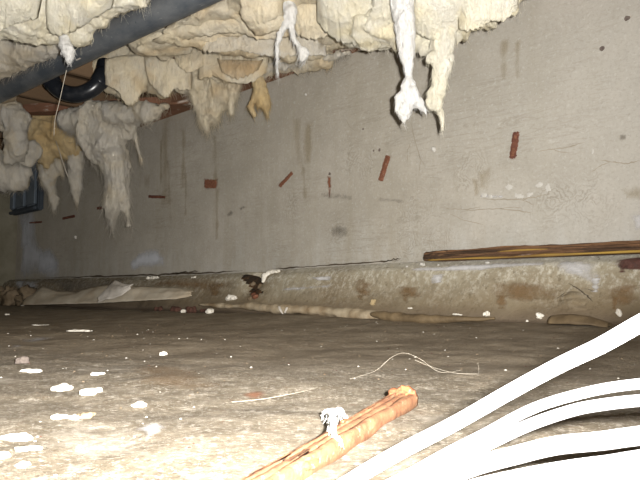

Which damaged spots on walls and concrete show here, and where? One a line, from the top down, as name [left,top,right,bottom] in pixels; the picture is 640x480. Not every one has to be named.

rust [509,131,519,159]
rust [378,155,390,181]
rust [204,179,217,189]
crack [275,258,399,269]
spalling [241,274,264,301]